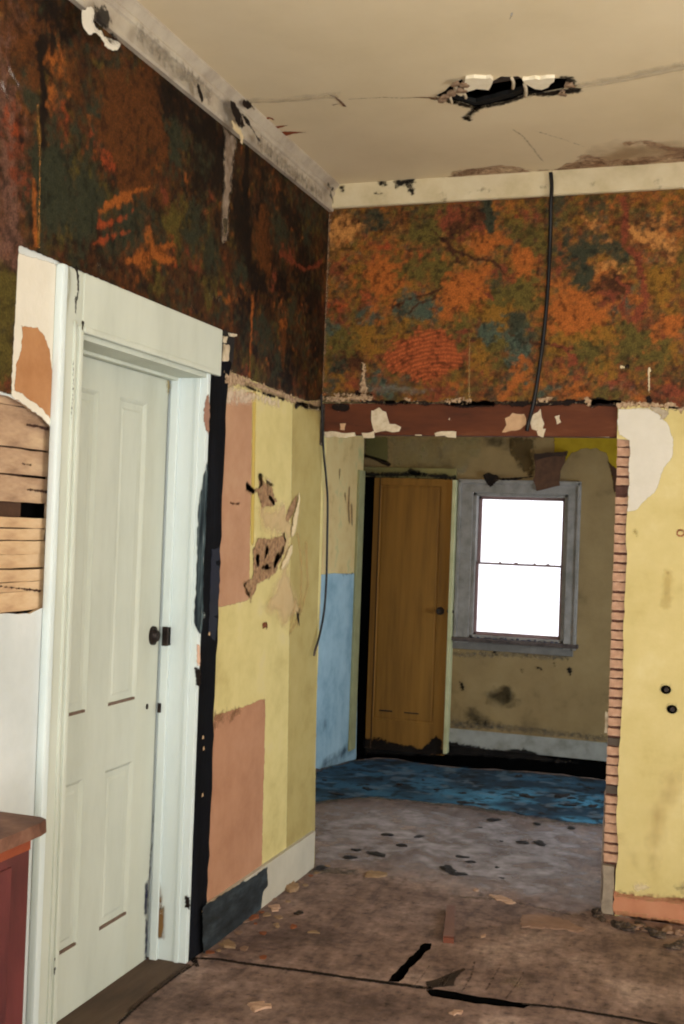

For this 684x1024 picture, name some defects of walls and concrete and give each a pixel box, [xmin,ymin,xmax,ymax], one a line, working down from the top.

flaking render [82,5,121,51]
flaking render [464,75,493,92]
flaking render [522,75,555,90]
spalling [374,179,416,195]
flaking render [11,326,52,426]
flaking render [218,330,373,607]
flaking render [616,401,684,512]